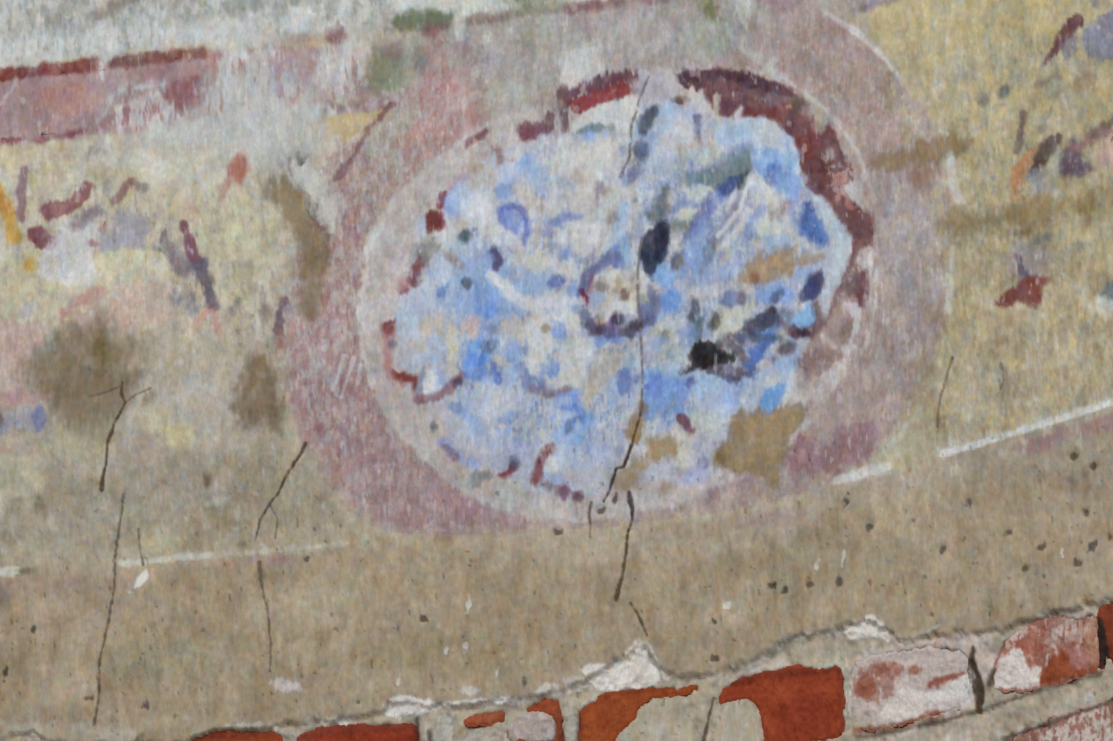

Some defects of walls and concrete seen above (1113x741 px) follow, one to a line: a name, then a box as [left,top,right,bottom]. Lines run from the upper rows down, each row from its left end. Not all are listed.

crack [589,242,647,635]
crack [93,382,144,723]
crack [256,442,307,671]
spalling [193,721,283,741]
spalling [297,685,698,741]
spalling [719,630,971,741]
spalling [988,603,1113,694]
spalling [1014,701,1113,741]